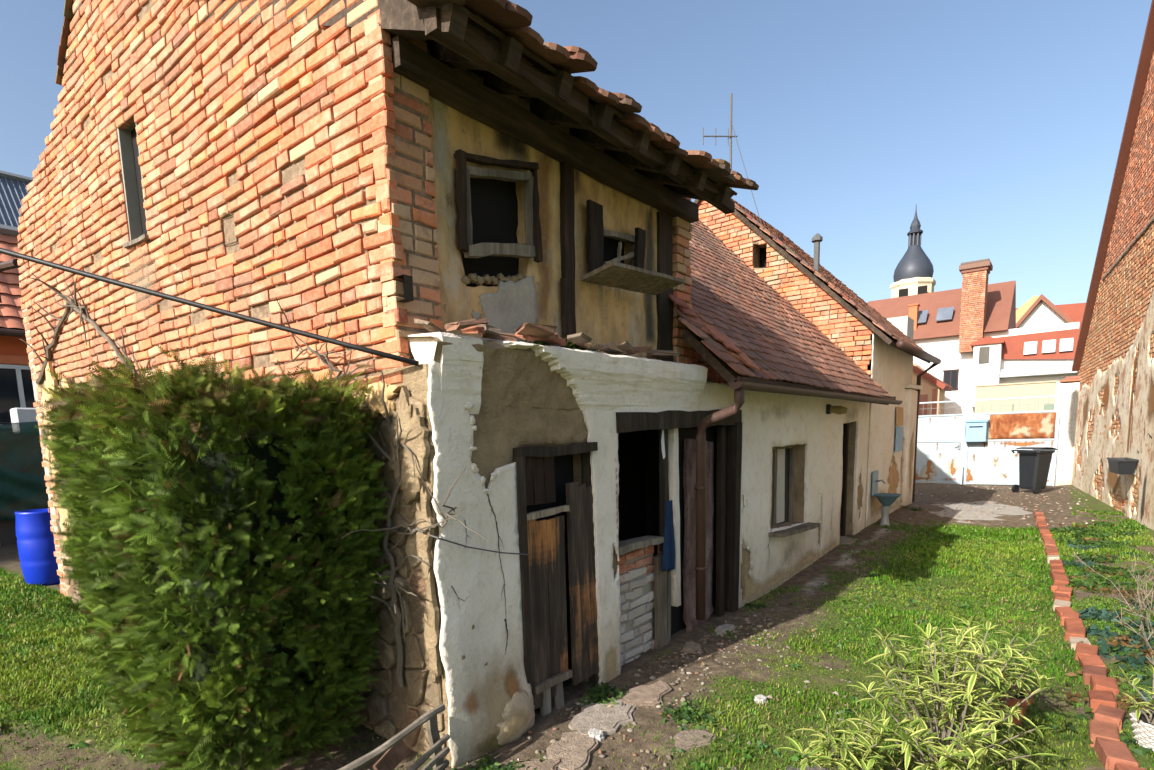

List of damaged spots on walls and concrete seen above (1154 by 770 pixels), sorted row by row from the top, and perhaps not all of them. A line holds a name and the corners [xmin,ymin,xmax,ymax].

peeling [40,361,75,545]
flaking render [465,396,588,495]
peeling [887,457,899,493]
rust [915,413,1056,482]
peeling [1071,289,1154,530]
crack [464,494,508,654]